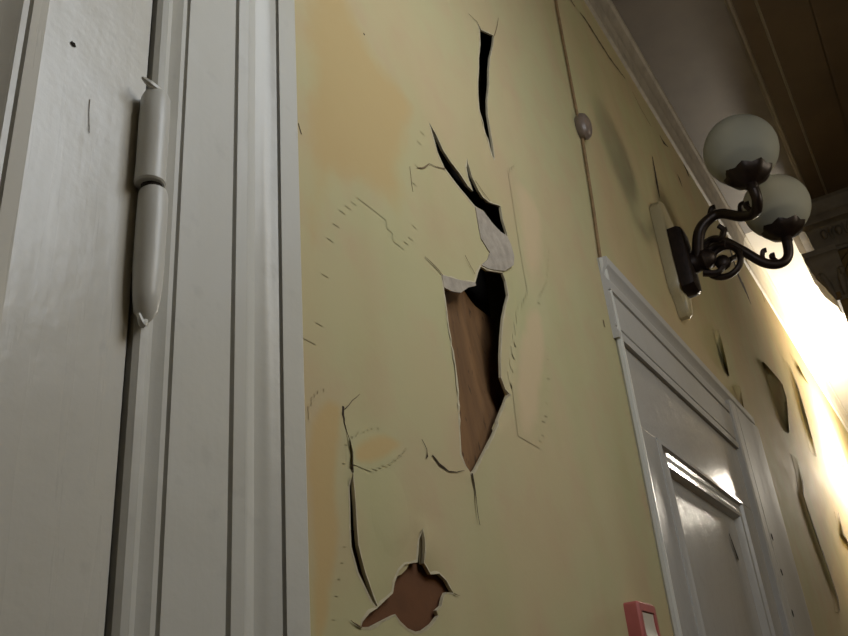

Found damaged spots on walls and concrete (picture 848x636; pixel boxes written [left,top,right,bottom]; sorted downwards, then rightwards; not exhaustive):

flaking render [418,123,514,524]
crack [342,398,378,608]
spalling [351,528,459,634]